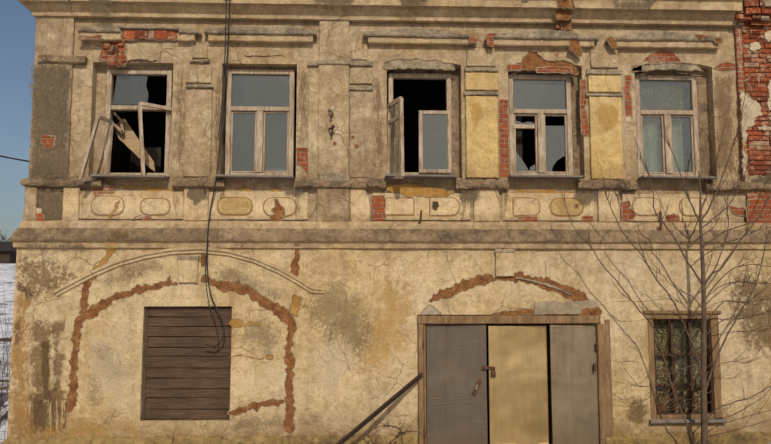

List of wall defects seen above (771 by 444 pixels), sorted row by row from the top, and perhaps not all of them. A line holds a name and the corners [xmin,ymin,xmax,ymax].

flaking render [78,29,178,68]
flaking render [498,99,510,178]
flaking render [506,0,590,136]
flaking render [624,0,771,223]
flaking render [621,201,636,222]
damp [28,321,67,435]